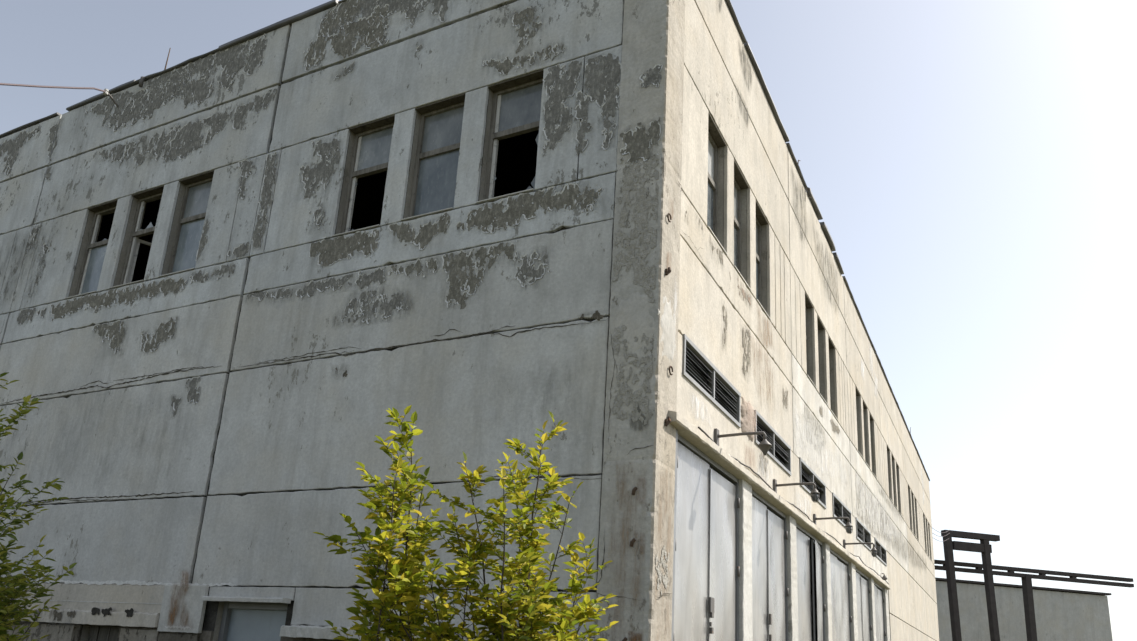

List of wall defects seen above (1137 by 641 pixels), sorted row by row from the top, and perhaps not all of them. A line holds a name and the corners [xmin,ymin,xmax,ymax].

peeling [85,33,267,131]
peeling [98,89,277,165]
peeling [303,0,448,80]
spalling [482,7,662,303]
peeling [16,151,278,353]
peeling [247,138,603,324]
crack [2,320,653,455]
spalling [612,325,653,425]
spalling [742,330,751,374]
crack [530,473,602,481]